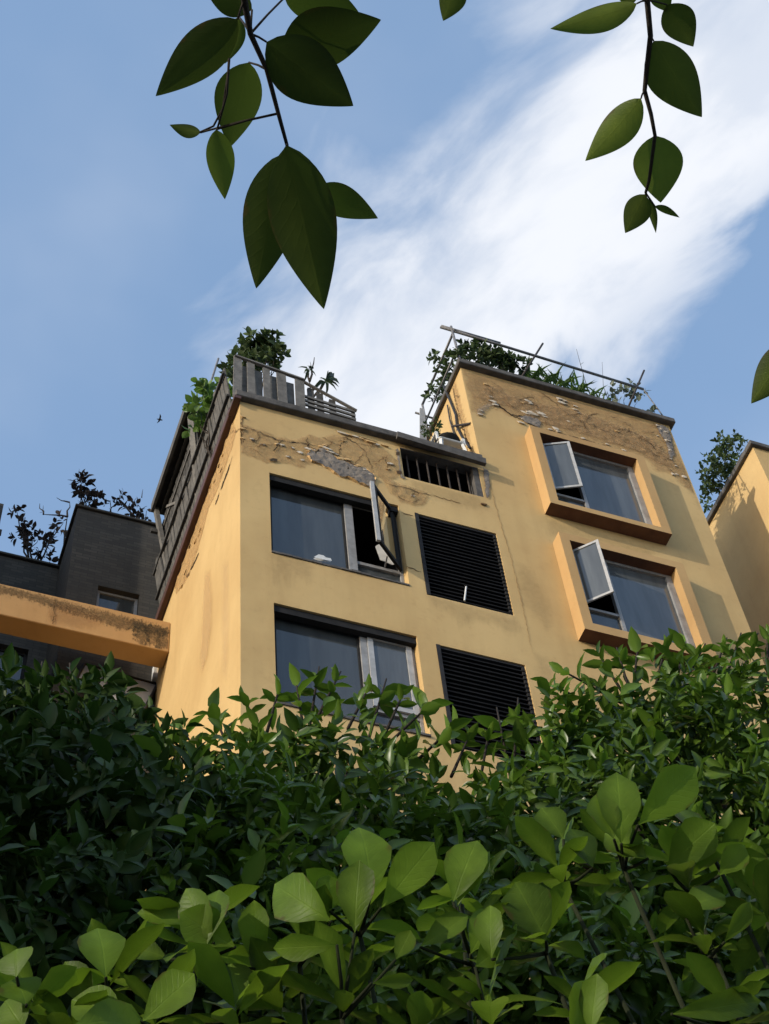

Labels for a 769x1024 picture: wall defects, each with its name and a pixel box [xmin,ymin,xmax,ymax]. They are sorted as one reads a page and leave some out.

flaking render [517,410,548,428]
crack [207,415,389,504]
flaking render [656,424,687,479]
peeling [175,423,405,593]
crack [174,528,201,591]